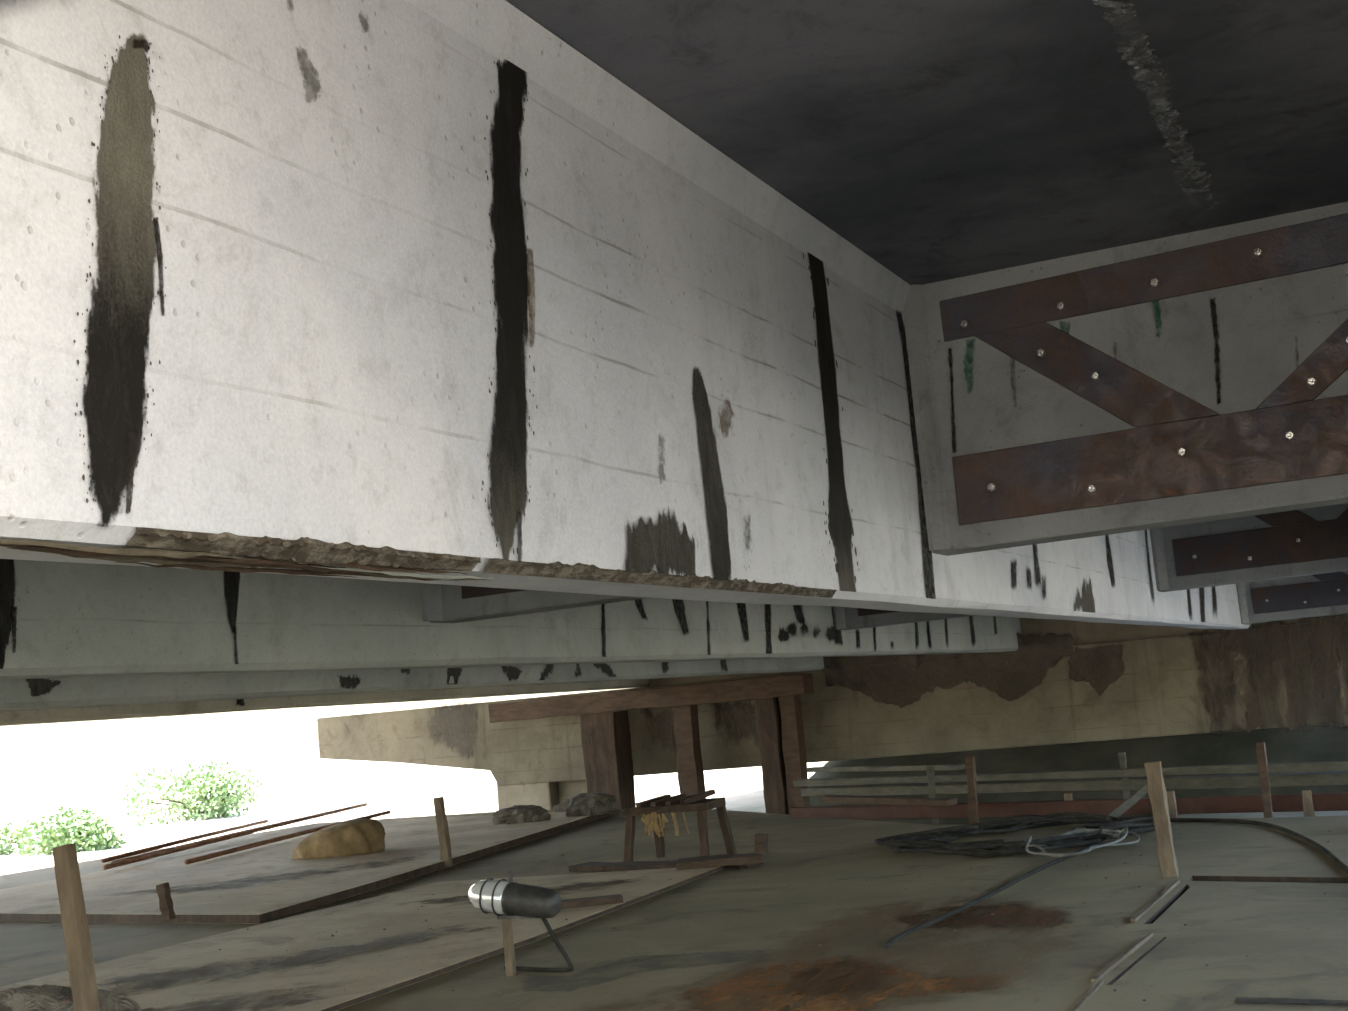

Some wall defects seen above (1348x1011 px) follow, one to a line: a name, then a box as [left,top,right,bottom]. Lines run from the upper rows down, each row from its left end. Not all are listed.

water stain [719,400,733,436]
spalling [0,527,837,598]
water stain [626,509,696,578]
peeling [822,632,1125,708]
water stain [1189,614,1348,735]